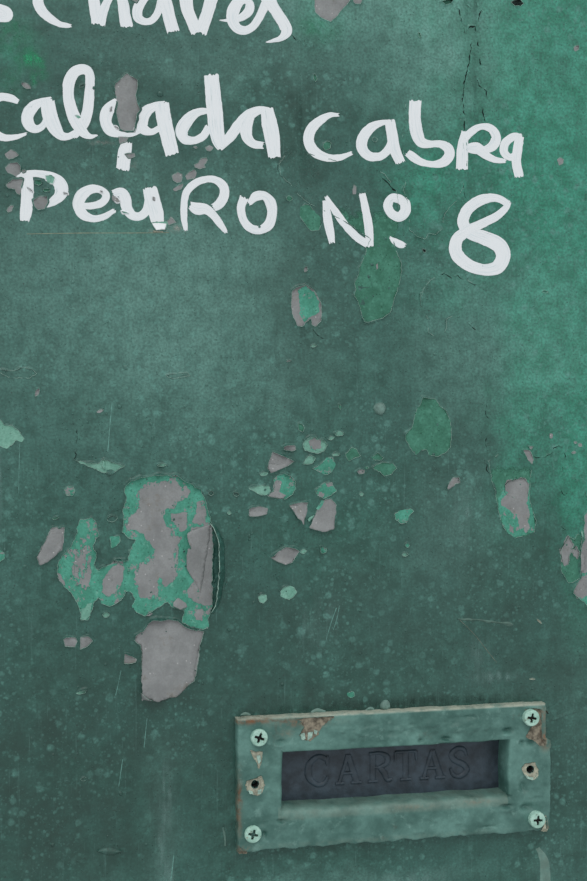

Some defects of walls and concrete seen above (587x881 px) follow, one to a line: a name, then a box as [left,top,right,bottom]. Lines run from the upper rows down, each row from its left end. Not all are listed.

peeling [312,0,363,24]
peeling [110,71,142,159]
peeling [278,90,464,329]
peeling [0,419,25,449]
peeling [402,395,453,459]
peeling [247,434,338,532]
peeling [487,445,538,539]
peeling [35,457,225,702]
peeling [269,545,300,567]
peeling [279,585,298,601]
peeling [559,510,587,610]